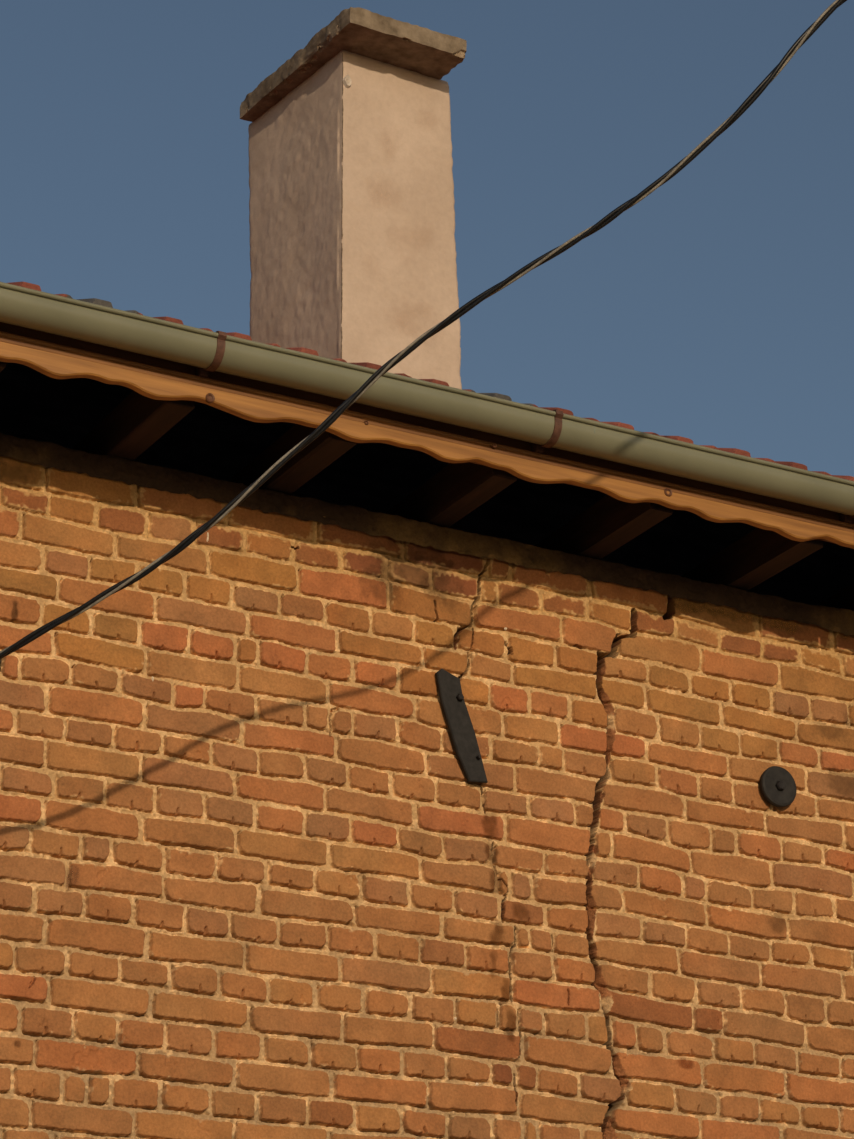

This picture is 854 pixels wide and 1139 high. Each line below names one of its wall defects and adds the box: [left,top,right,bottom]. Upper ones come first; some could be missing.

crack [433,559,488,680]
crack [490,843,521,1106]
crack [567,595,675,1139]